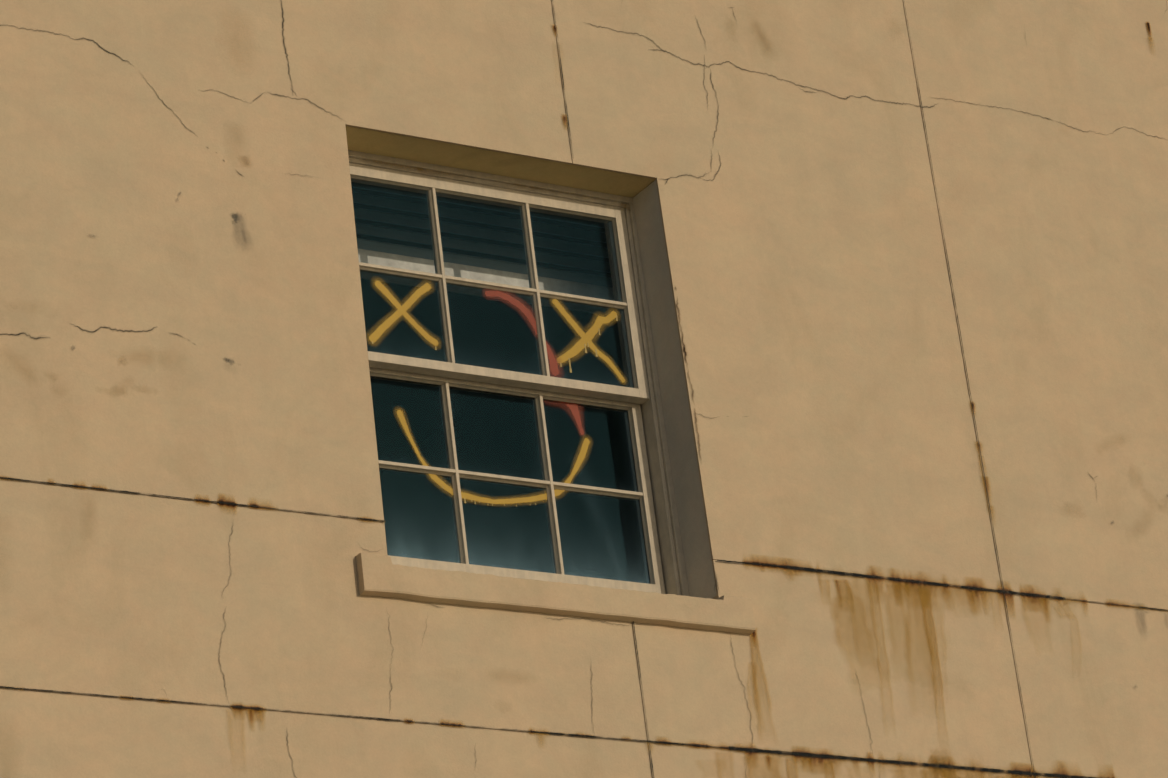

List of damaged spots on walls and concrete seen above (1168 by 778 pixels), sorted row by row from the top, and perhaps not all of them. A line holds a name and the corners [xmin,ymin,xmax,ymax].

crack [10,25,126,61]
crack [226,1,331,113]
crack [589,21,1085,183]
crack [77,326,178,335]
corrosion [196,497,272,509]
corrosion [865,571,1087,609]
corrosion [232,704,265,721]
corrosion [688,743,770,765]
corrosion [792,750,956,778]